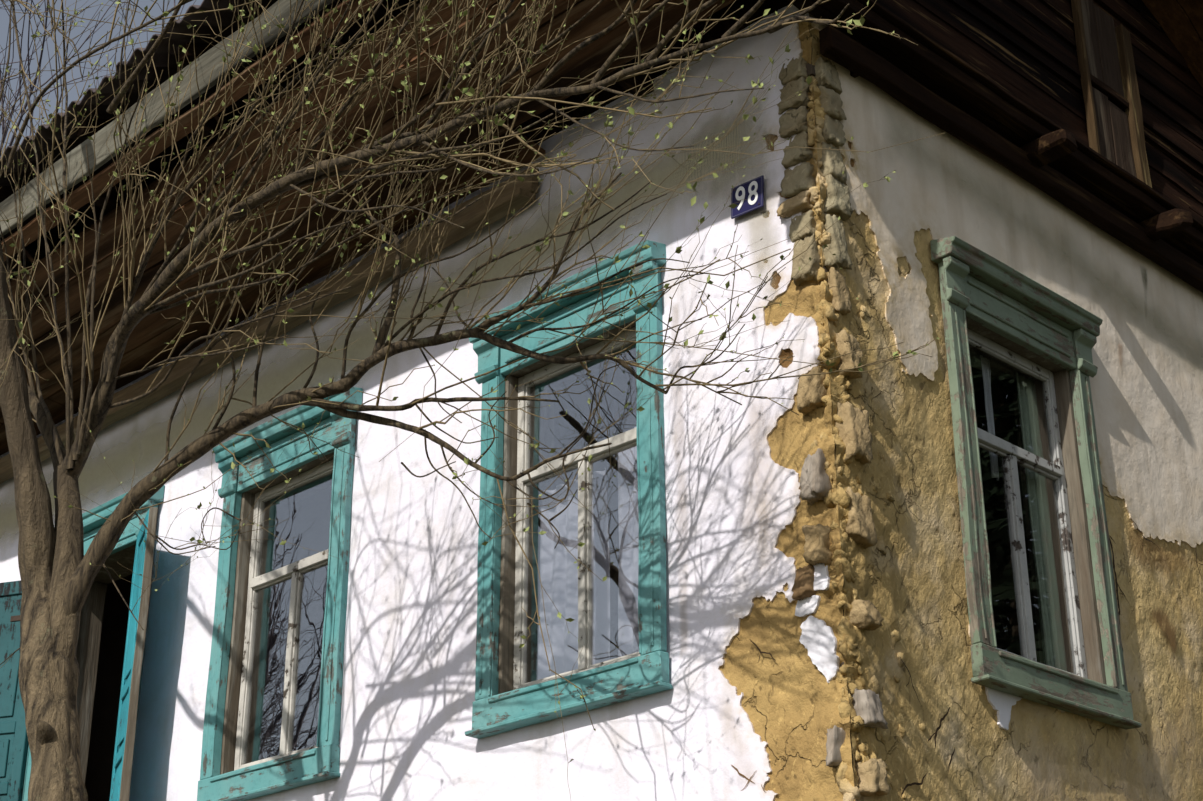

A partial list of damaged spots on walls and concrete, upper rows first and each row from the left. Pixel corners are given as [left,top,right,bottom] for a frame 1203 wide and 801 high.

flaking render [720,22,1203,801]
crack [1109,517,1161,649]
crack [750,640,776,662]
crack [731,765,765,792]
crack [900,657,955,797]